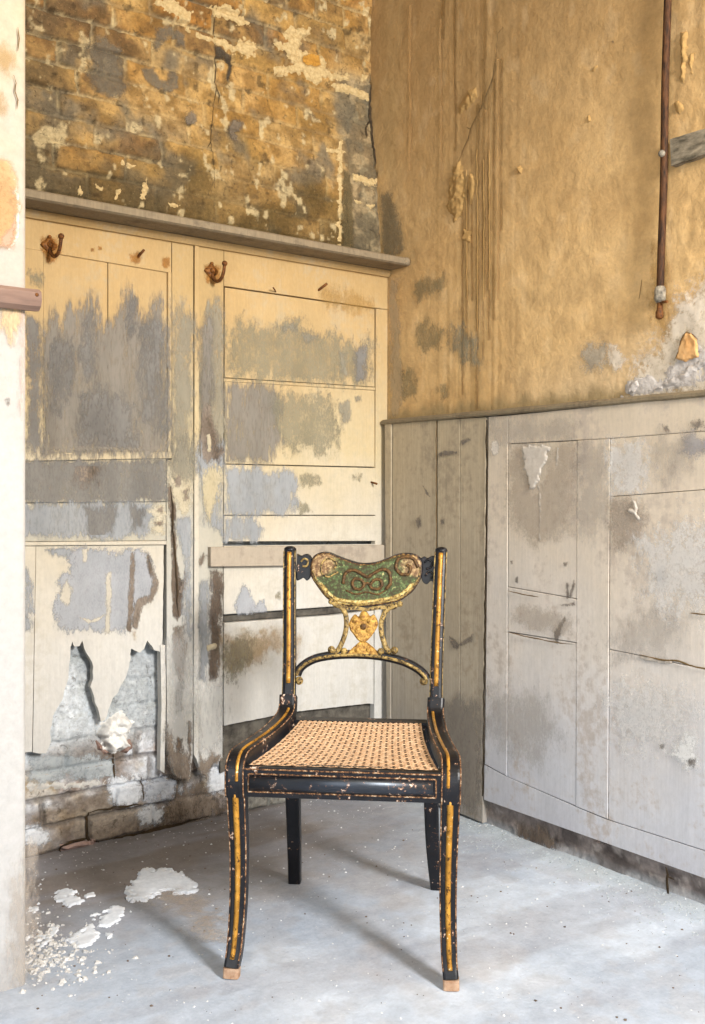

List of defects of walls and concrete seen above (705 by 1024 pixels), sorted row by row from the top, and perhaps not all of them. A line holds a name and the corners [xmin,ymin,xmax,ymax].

crack [208,4,220,188]
crack [365,82,378,177]
flaking render [620,333,705,398]
peeling [522,444,559,541]
peeling [45,546,155,635]
crack [639,654,705,670]